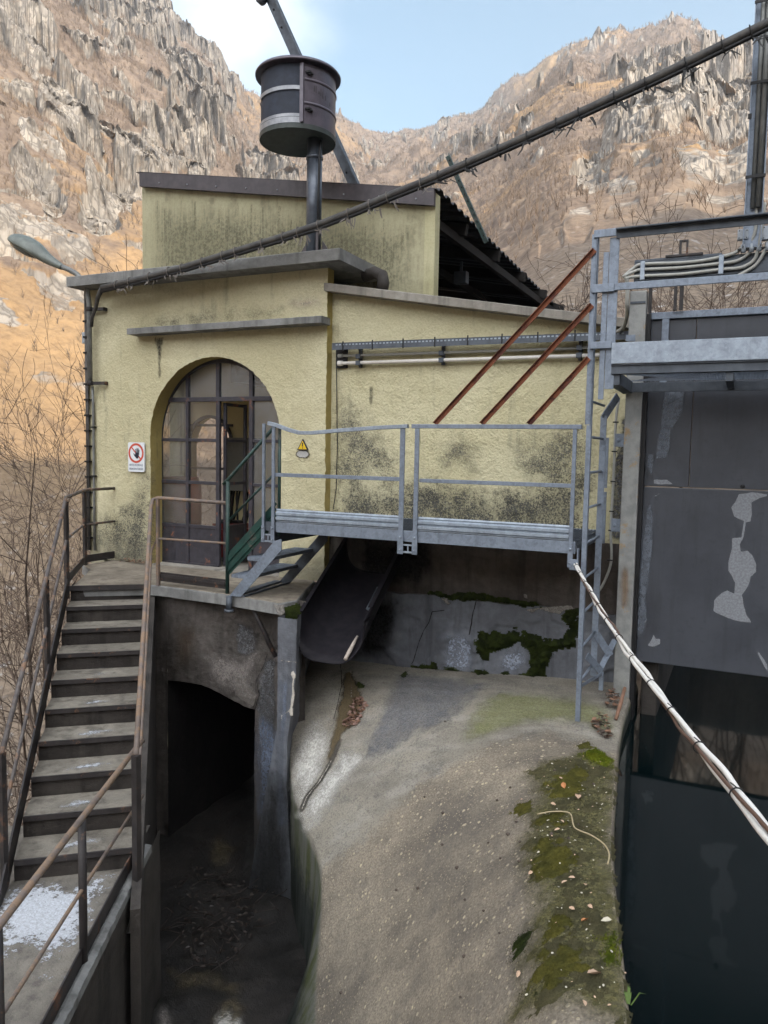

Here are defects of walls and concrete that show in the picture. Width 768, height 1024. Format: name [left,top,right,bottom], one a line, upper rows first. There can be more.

leakage [338,413,584,529]
peeling [637,392,683,647]
peeling [713,492,767,623]
leakage [246,671,360,898]